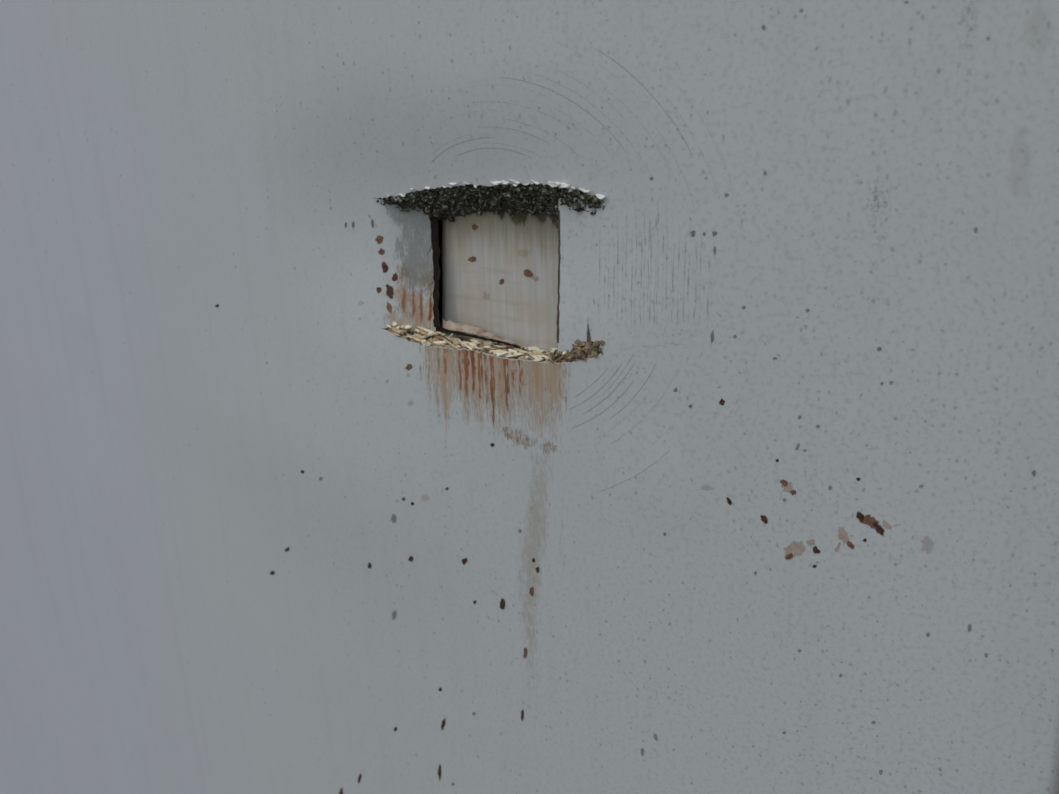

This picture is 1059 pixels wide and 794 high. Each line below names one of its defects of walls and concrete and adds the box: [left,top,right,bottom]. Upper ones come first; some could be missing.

corrosion [375,235,435,331]
spalling [372,179,606,363]
corrosion [425,346,565,447]